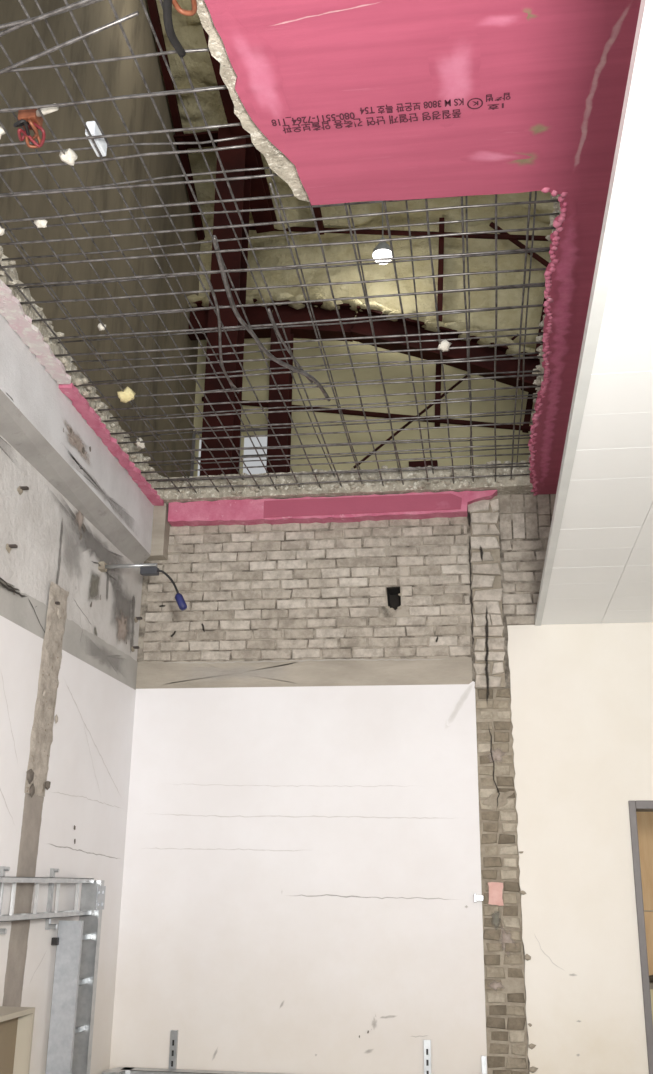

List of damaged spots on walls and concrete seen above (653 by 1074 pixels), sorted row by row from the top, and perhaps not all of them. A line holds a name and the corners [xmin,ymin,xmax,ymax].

spalling [0,0,560,493]
crack [48,671,500,819]
crack [43,843,318,860]
crack [283,893,463,901]